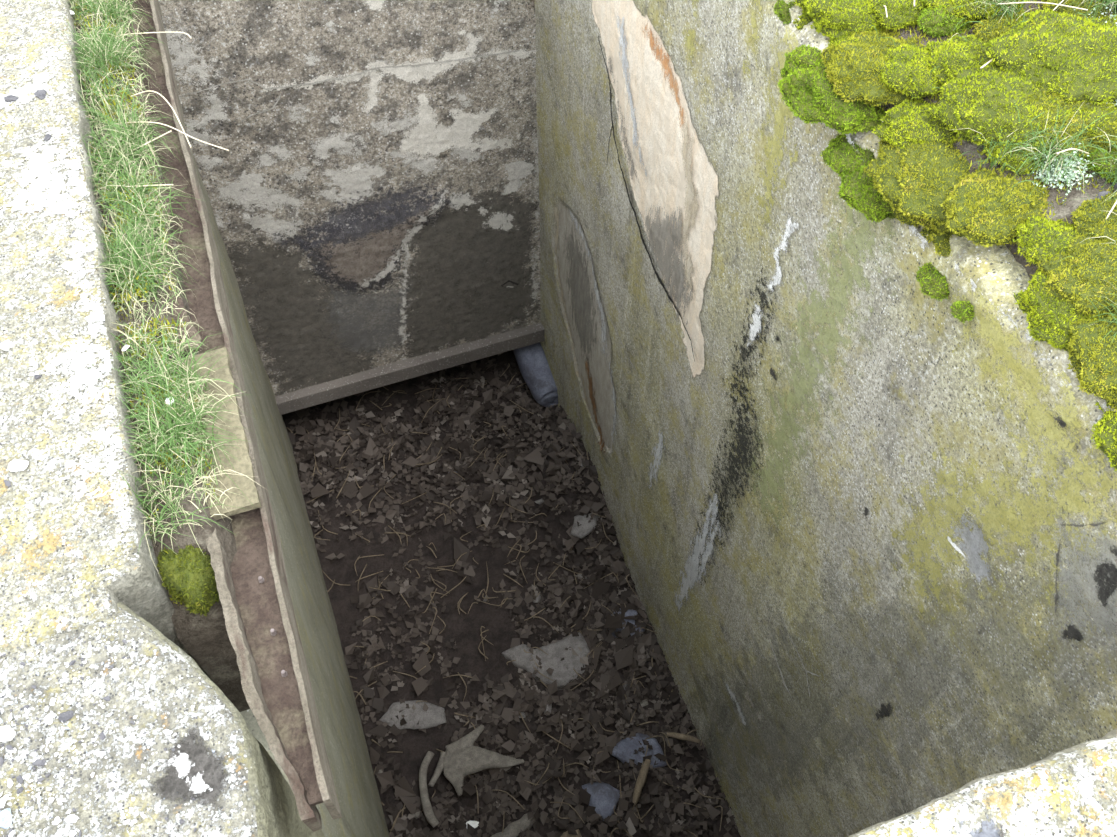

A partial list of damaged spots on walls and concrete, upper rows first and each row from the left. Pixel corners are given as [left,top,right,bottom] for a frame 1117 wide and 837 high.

damp [179,28,536,122]
damp [223,104,541,395]
spalling [592,0,719,377]
damp [673,218,799,614]